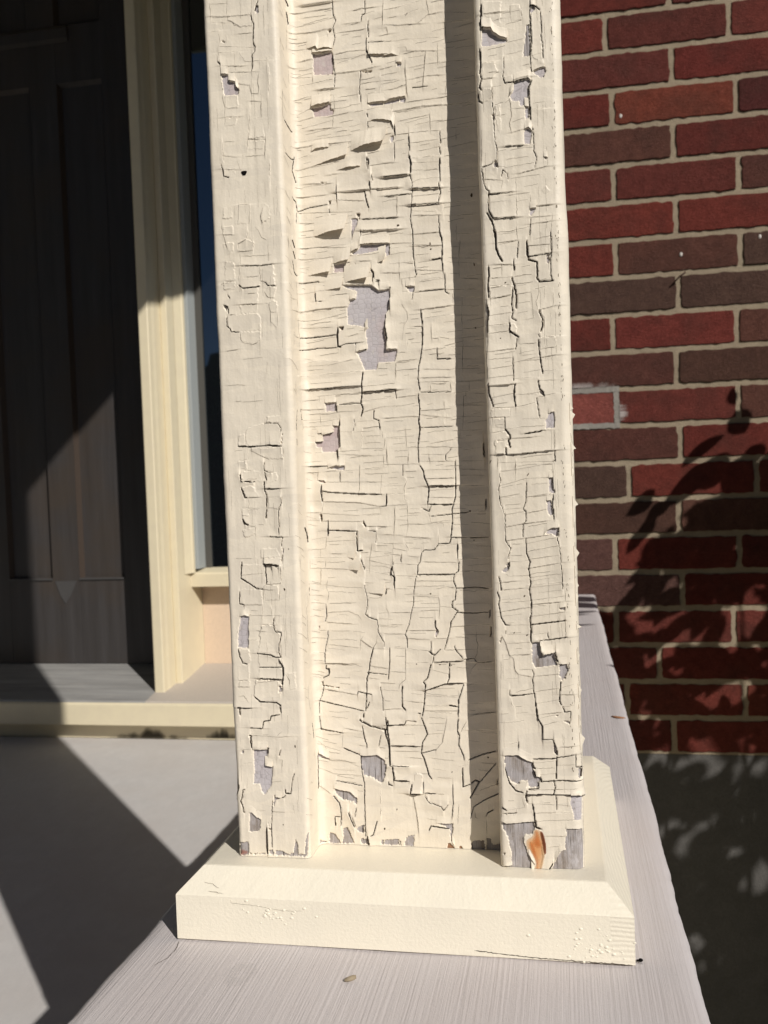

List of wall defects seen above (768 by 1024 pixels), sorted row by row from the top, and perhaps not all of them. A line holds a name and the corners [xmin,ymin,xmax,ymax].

peeling [220,65,239,95]
peeling [306,30,334,75]
peeling [480,0,546,144]
peeling [311,87,406,171]
peeling [308,202,398,370]
crack [210,0,583,854]
peeling [238,606,282,701]
peeling [532,634,585,750]
peeling [242,735,282,806]
peeling [360,747,387,782]
peeling [497,746,541,791]
rust [527,830,546,869]